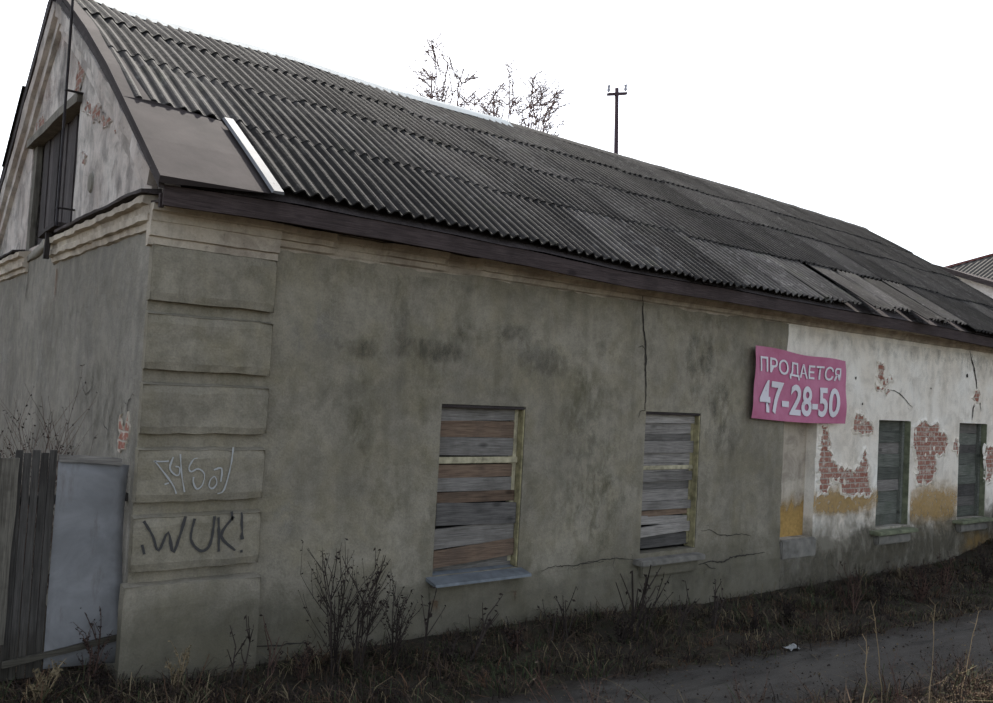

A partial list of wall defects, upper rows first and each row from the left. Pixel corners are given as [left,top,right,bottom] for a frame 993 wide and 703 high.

flaking render [75,60,116,134]
crack [639,296,647,415]
flaking render [875,360,895,396]
crack [970,353,981,418]
flaking render [815,403,875,499]
flaking render [910,416,960,489]
flaking render [983,442,993,486]
crack [543,554,633,571]
crack [699,529,764,569]